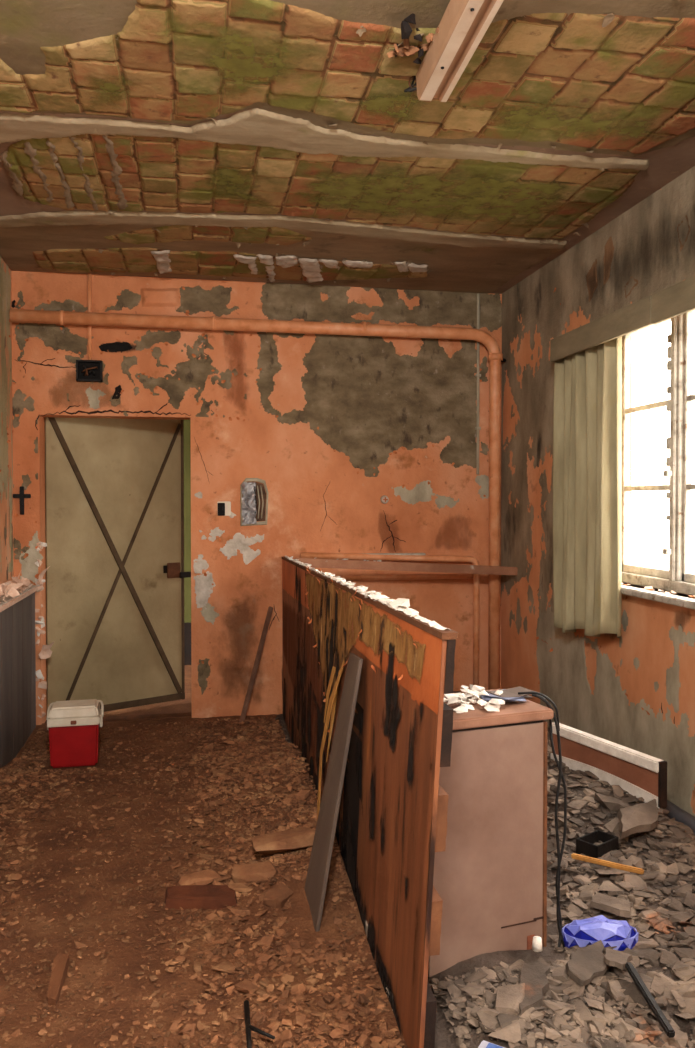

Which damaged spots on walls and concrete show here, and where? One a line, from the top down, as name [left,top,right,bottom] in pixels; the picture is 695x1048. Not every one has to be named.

flaking render [0,0,695,817]